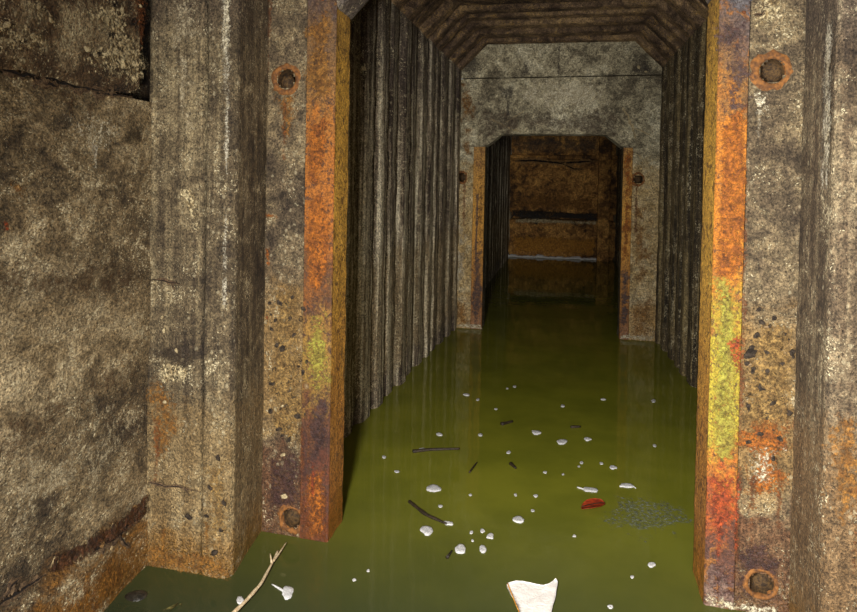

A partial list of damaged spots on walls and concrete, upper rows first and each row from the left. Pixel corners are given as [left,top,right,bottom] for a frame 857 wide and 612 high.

crack [0,69,133,101]
corrosion [305,117,329,290]
corrosion [709,22,794,601]
corrosion [266,313,330,537]
crack [0,573,46,607]
crack [89,512,147,555]